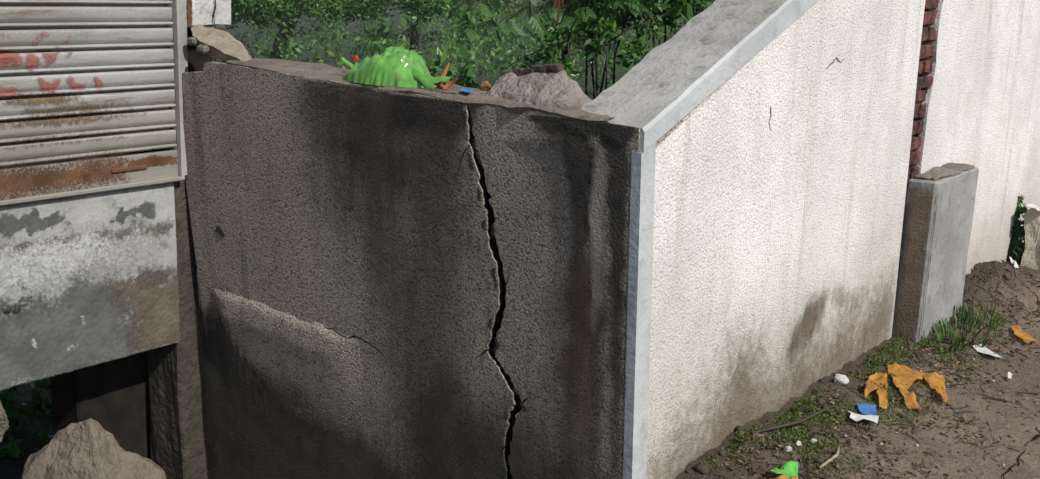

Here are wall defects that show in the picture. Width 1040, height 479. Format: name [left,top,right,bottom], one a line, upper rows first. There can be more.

rust [0,92,177,204]
damp [308,81,475,291]
peeling [0,202,180,391]
damp [200,316,398,479]
crack [458,111,527,479]
damp [415,115,635,479]